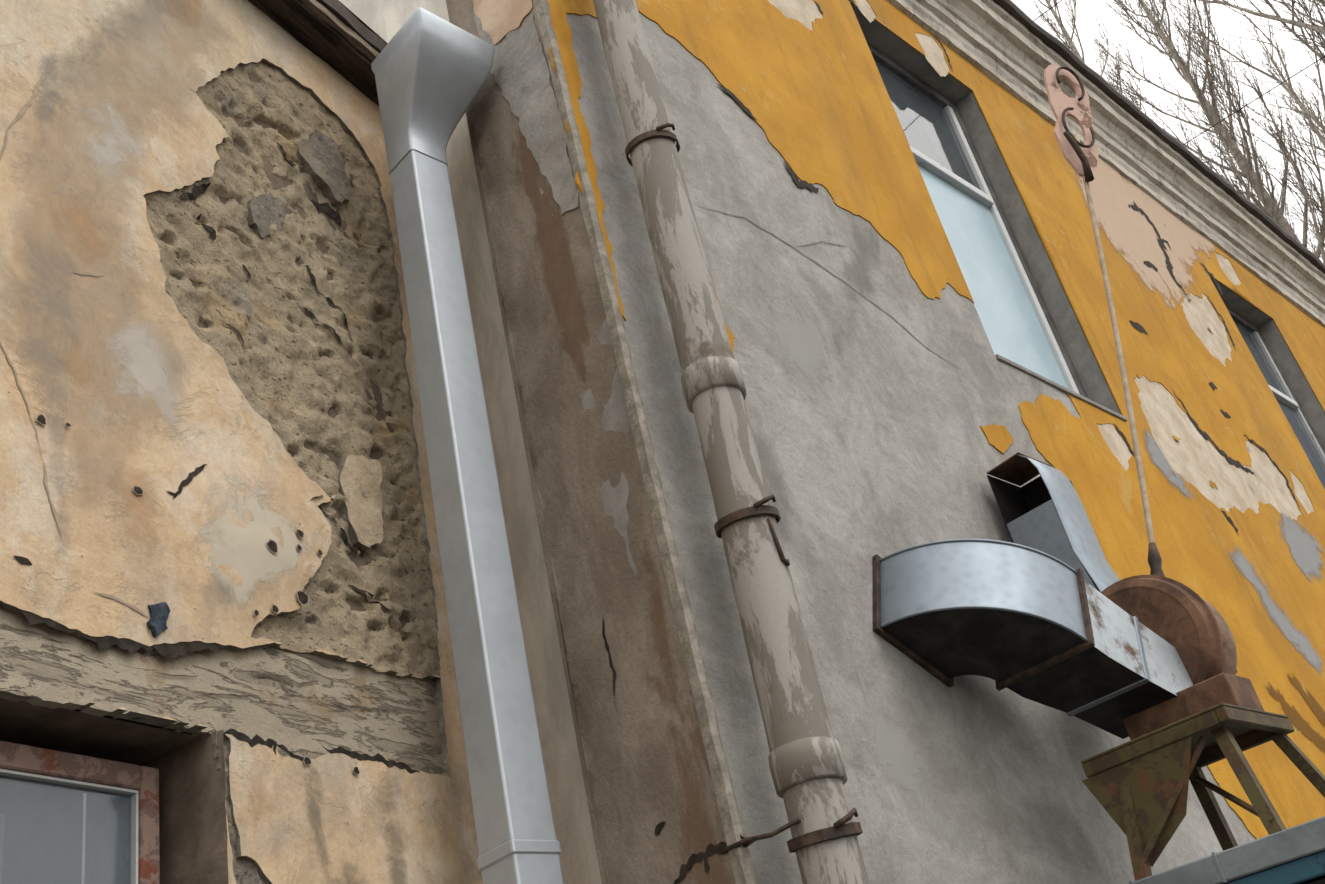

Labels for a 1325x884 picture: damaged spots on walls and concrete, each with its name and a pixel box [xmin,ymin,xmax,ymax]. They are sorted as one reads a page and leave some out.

peeling [768,0,823,31]
peeling [915,33,953,77]
crack [0,58,54,160]
crack [697,205,958,368]
peeling [1181,252,1241,367]
efflorescence [117,328,170,411]
spalling [144,61,437,680]
crack [0,340,62,537]
crack [167,464,207,498]
peeling [1097,423,1135,471]
peeling [1134,376,1315,535]
crack [602,615,616,695]